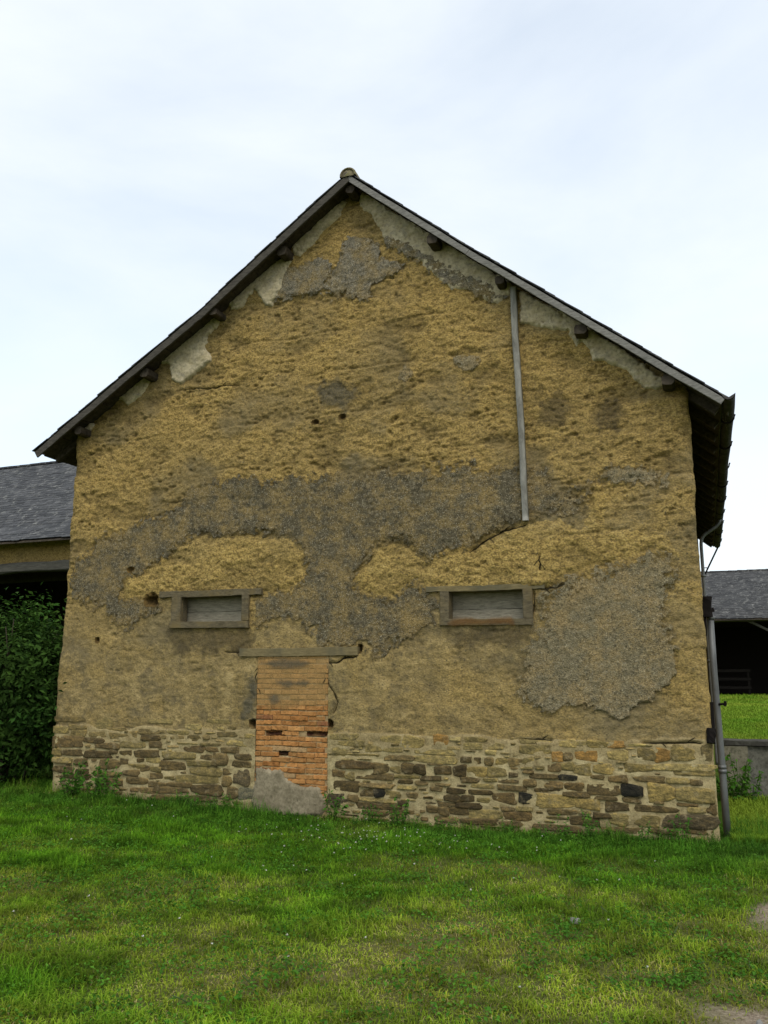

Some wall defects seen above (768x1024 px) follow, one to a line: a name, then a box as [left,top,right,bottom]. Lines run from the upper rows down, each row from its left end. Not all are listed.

flaking render [229,192,663,390]
flaking render [162,318,220,384]
flaking render [119,378,150,406]
crack [469,525,526,553]
flaking render [69,457,681,720]
crack [323,652,360,712]